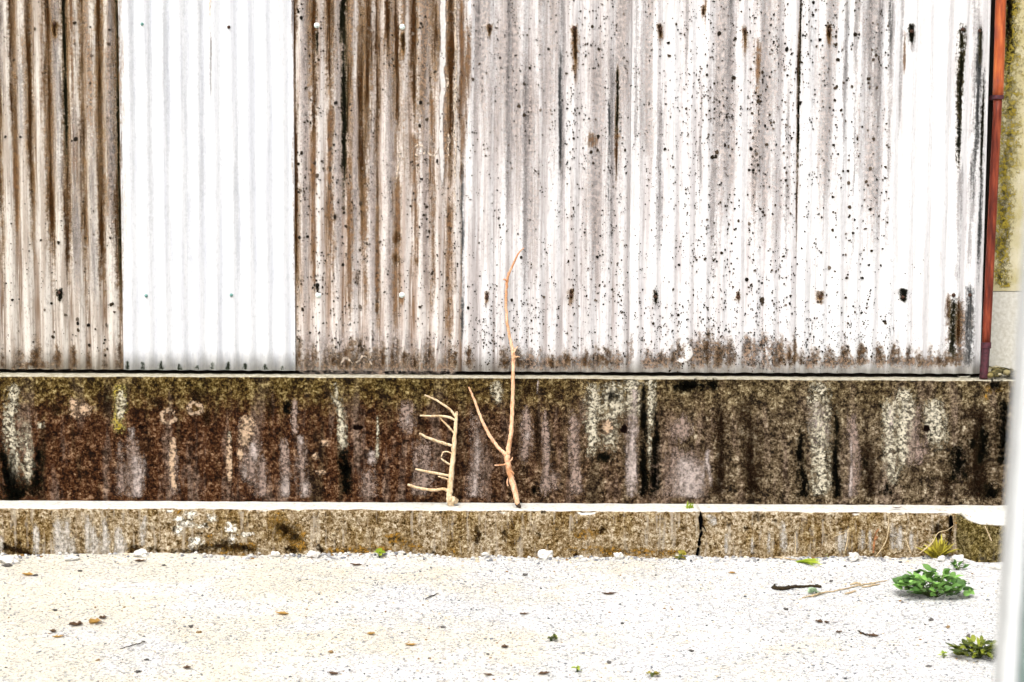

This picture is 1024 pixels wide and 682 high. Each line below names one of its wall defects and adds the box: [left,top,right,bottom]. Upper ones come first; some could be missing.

damp [752,0,810,236]
damp [955,11,986,264]
damp [499,279,979,394]
damp [0,431,46,501]
damp [100,385,145,497]
damp [168,437,191,494]
damp [265,397,311,497]
damp [520,408,557,496]
damp [568,386,661,498]
damp [831,410,892,498]
damp [940,378,1010,498]
crack [695,512,706,556]